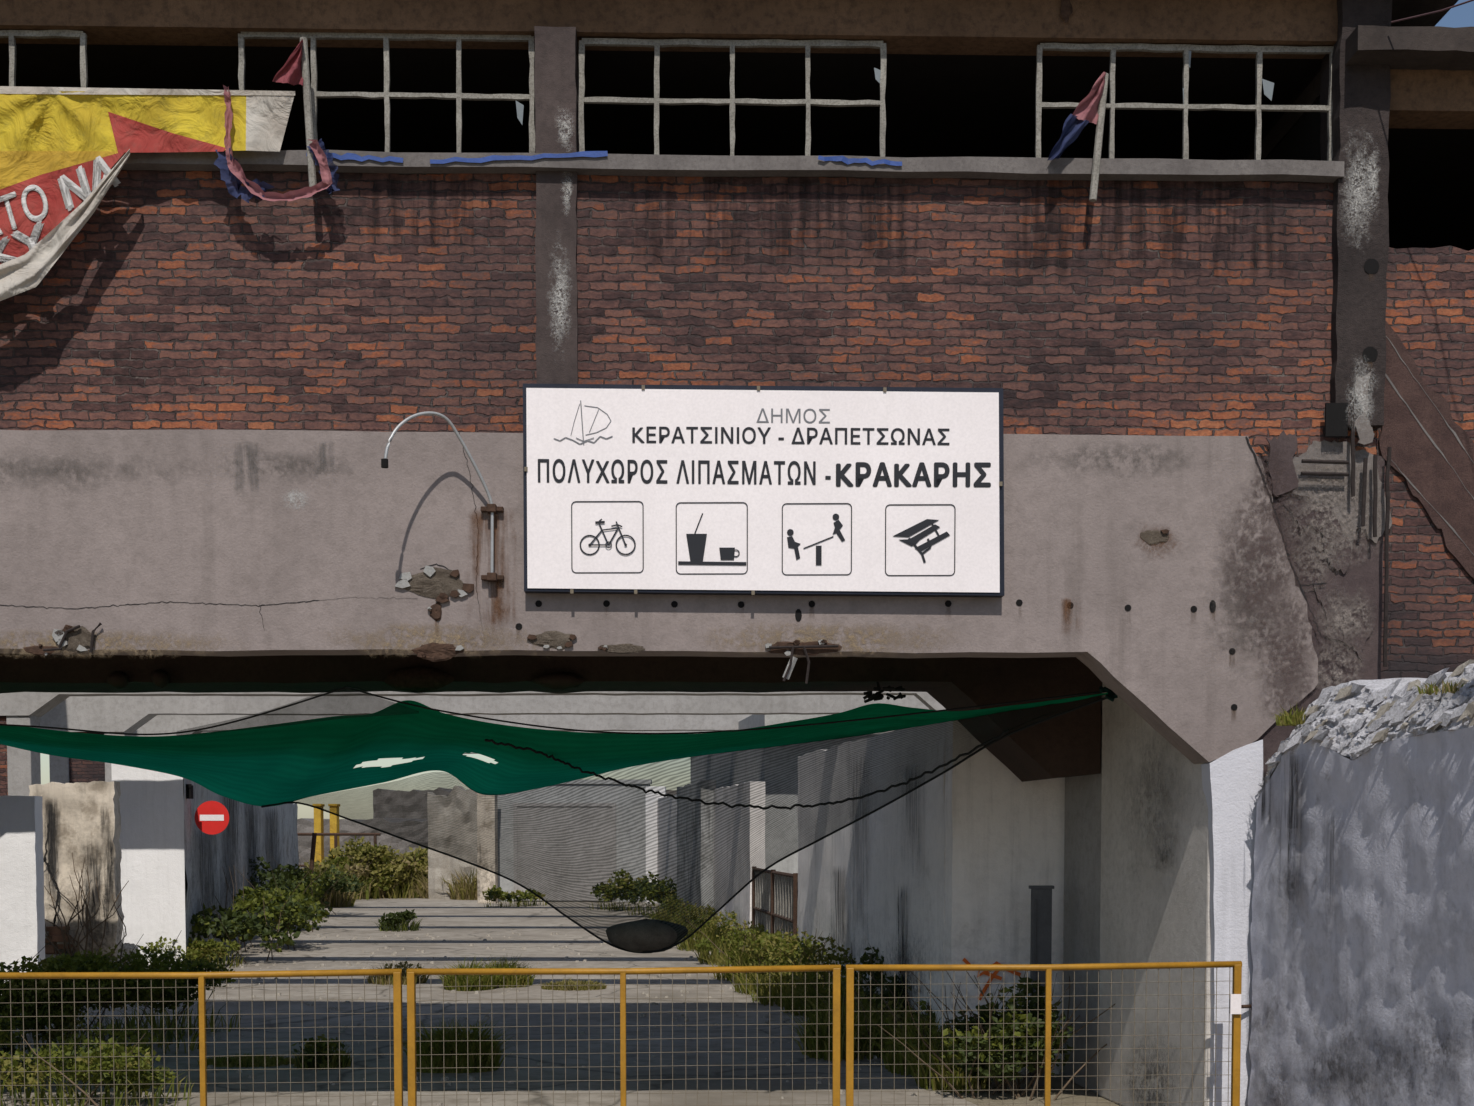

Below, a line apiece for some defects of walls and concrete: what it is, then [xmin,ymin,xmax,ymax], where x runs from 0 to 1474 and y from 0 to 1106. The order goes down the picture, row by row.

spalling [23,623,102,656]
crack [1,433,485,641]
rust [353,514,505,650]
spalling [395,566,474,603]
spalling [527,631,577,649]
water stain [1231,457,1311,705]
water stain [45,801,57,892]
water stain [85,809,114,940]